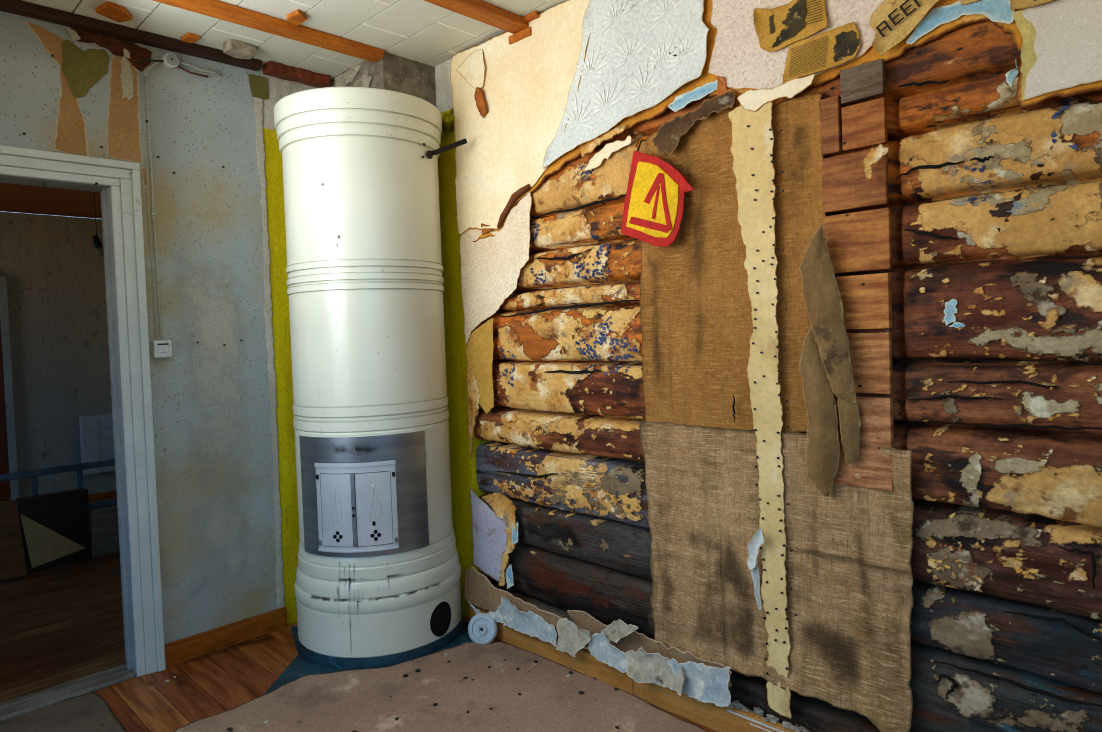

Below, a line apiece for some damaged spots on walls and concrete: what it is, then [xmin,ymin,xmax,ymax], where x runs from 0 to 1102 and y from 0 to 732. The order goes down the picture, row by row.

peeling [862,59,1102,362]
peeling [476,131,647,589]
peeling [940,390,959,423]
peeling [1013,374,1080,422]
water stain [723,548,752,652]
water stain [806,627,854,676]
peeling [914,452,1102,660]
peeling [930,671,1091,732]